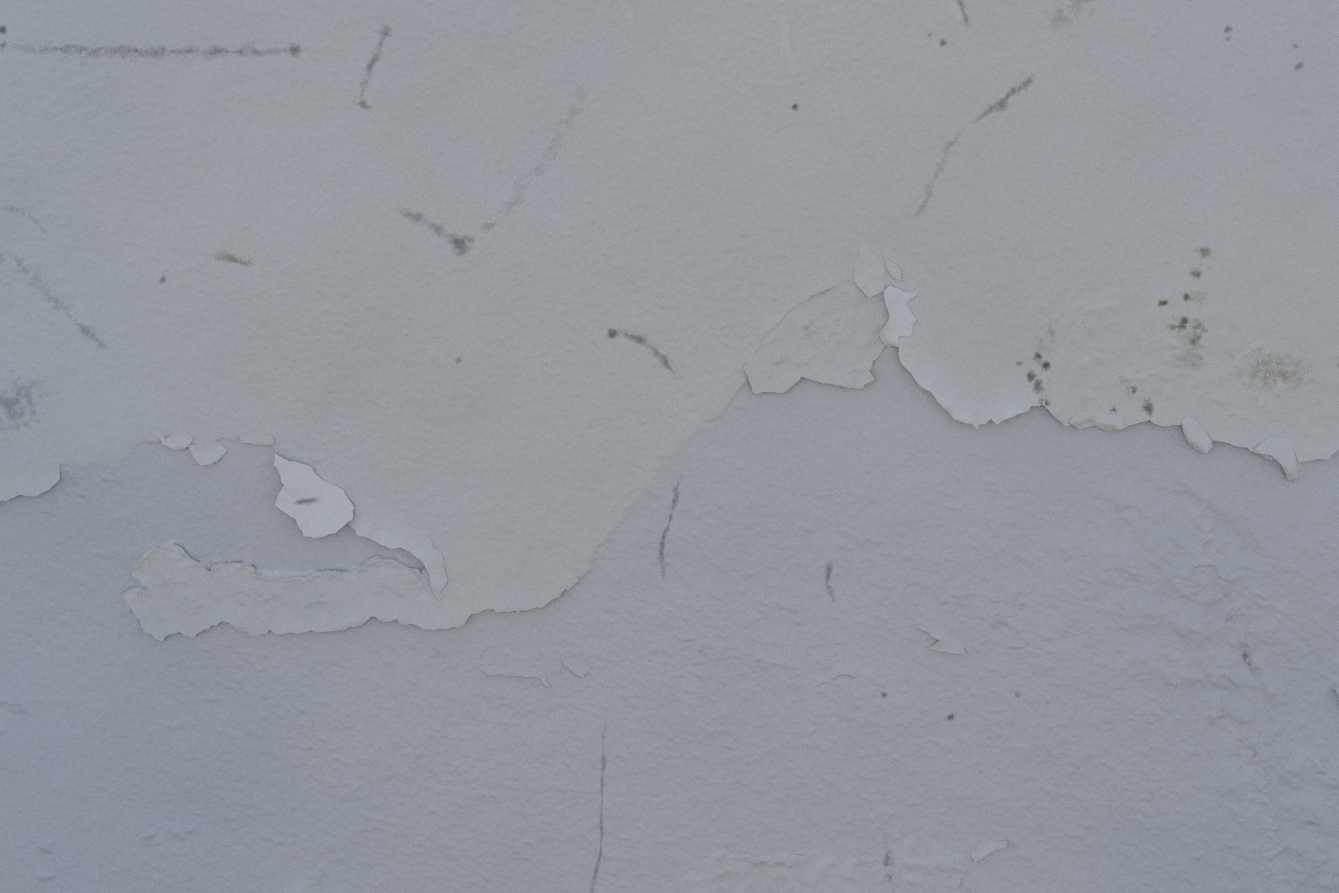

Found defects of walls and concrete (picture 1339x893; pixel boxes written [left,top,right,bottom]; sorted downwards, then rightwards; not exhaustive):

peeling [737,239,1339,482]
peeling [0,462,61,501]
peeling [122,454,579,641]